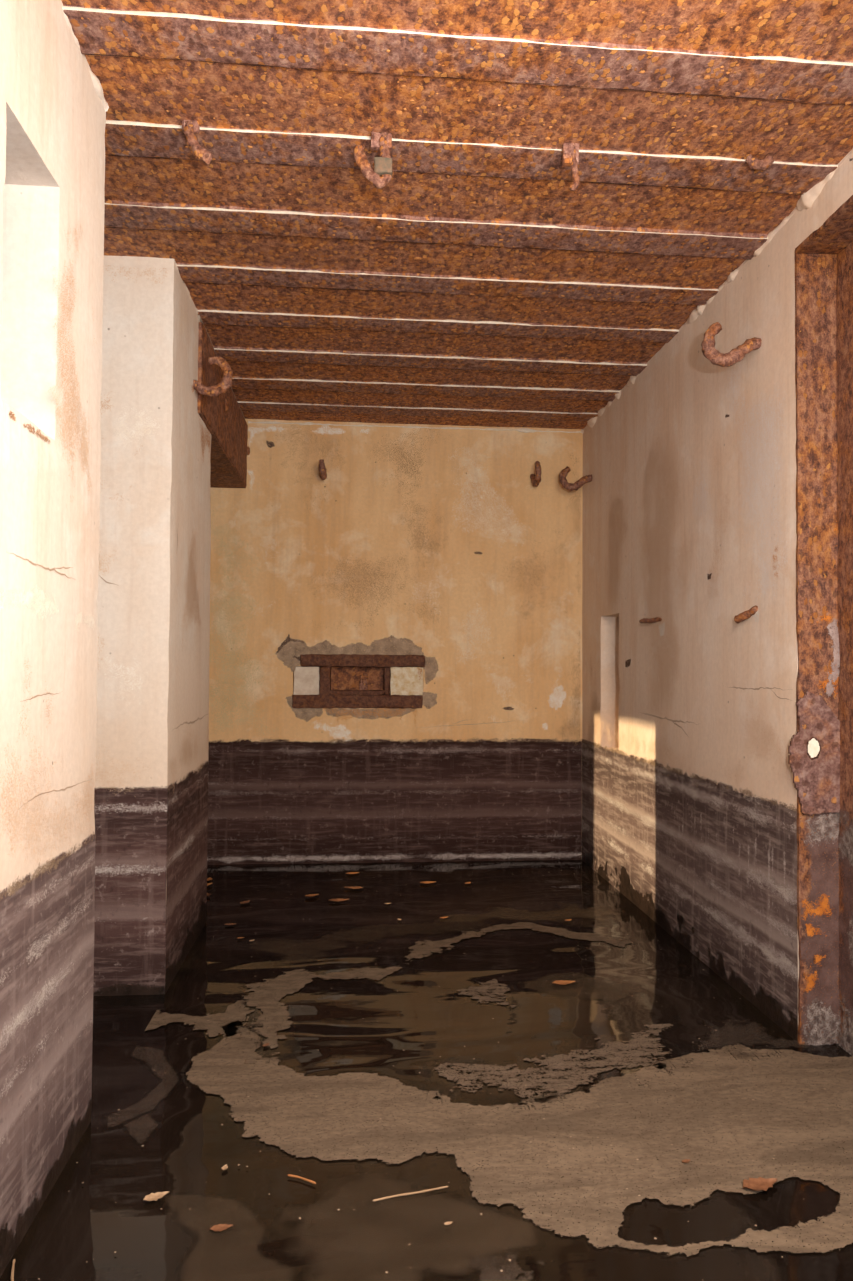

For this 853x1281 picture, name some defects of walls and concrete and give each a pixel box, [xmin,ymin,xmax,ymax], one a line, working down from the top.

rust [47,224,93,502]
crack [9,553,119,586]
spalling [274,635,439,722]
rust [809,610,840,698]
crack [20,779,91,808]
damp [0,424,853,1277]
rust [801,894,832,938]
rust [803,954,826,993]